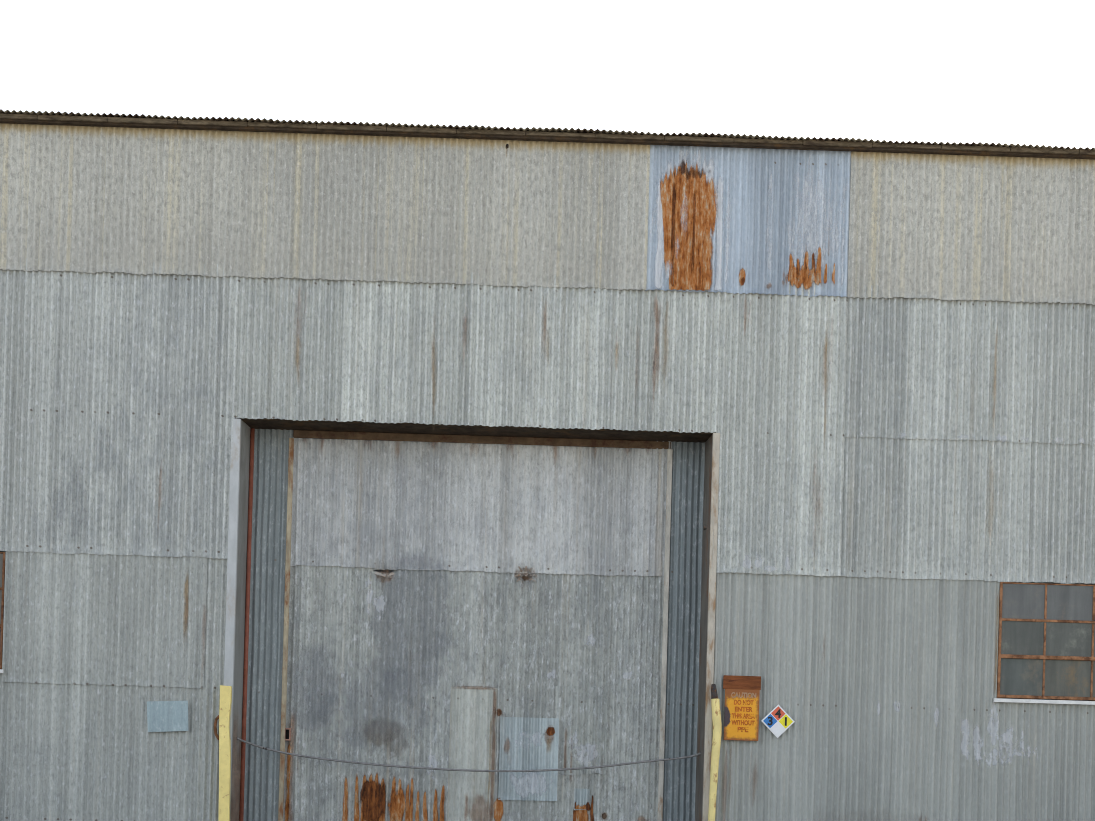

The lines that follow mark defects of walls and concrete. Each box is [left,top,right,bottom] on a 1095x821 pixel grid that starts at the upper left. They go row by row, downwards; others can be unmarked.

rust [655,150,723,291]
rust [788,182,838,289]
rust [342,773,445,821]
rust [573,795,607,821]